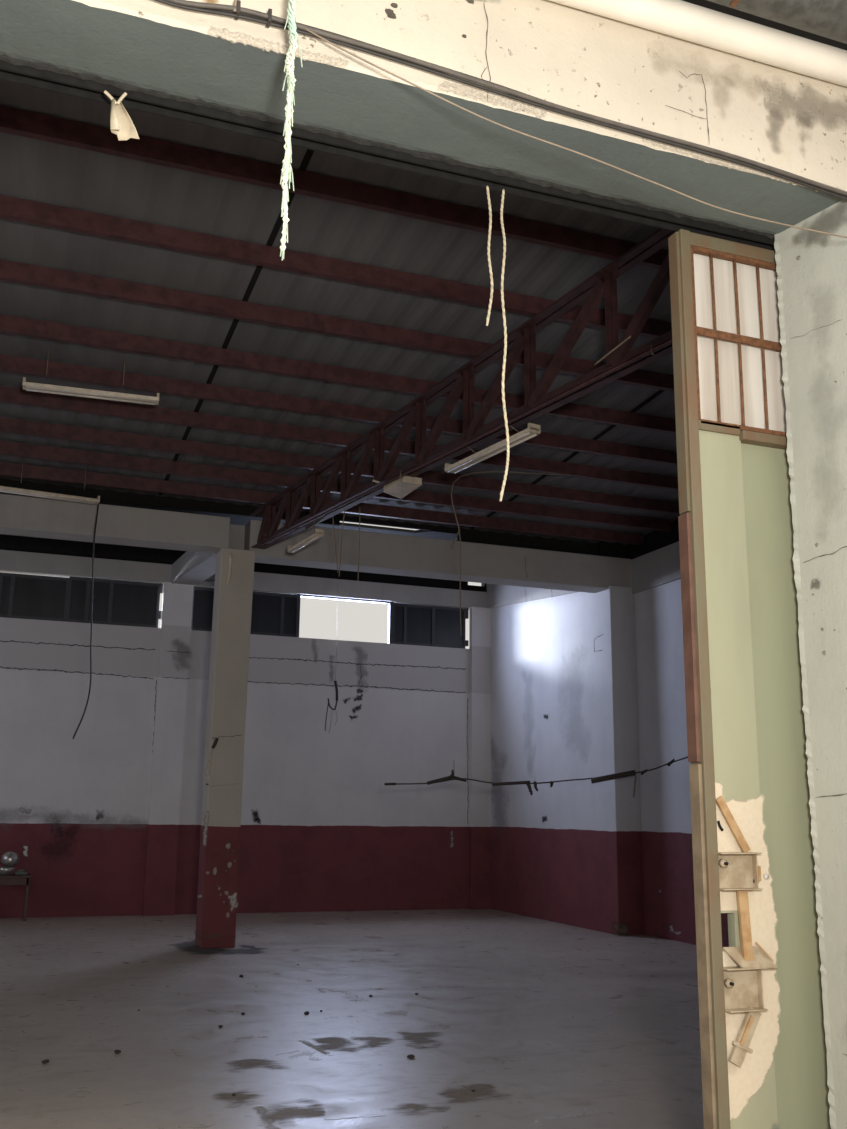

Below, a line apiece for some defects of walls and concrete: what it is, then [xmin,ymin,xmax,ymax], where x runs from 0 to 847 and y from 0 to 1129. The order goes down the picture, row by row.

peeling [385,3,398,19]
crack [481,4,491,100]
crack [665,71,709,136]
water stain [769,88,847,141]
peeling [206,843,238,918]
peeling [715,782,780,1121]